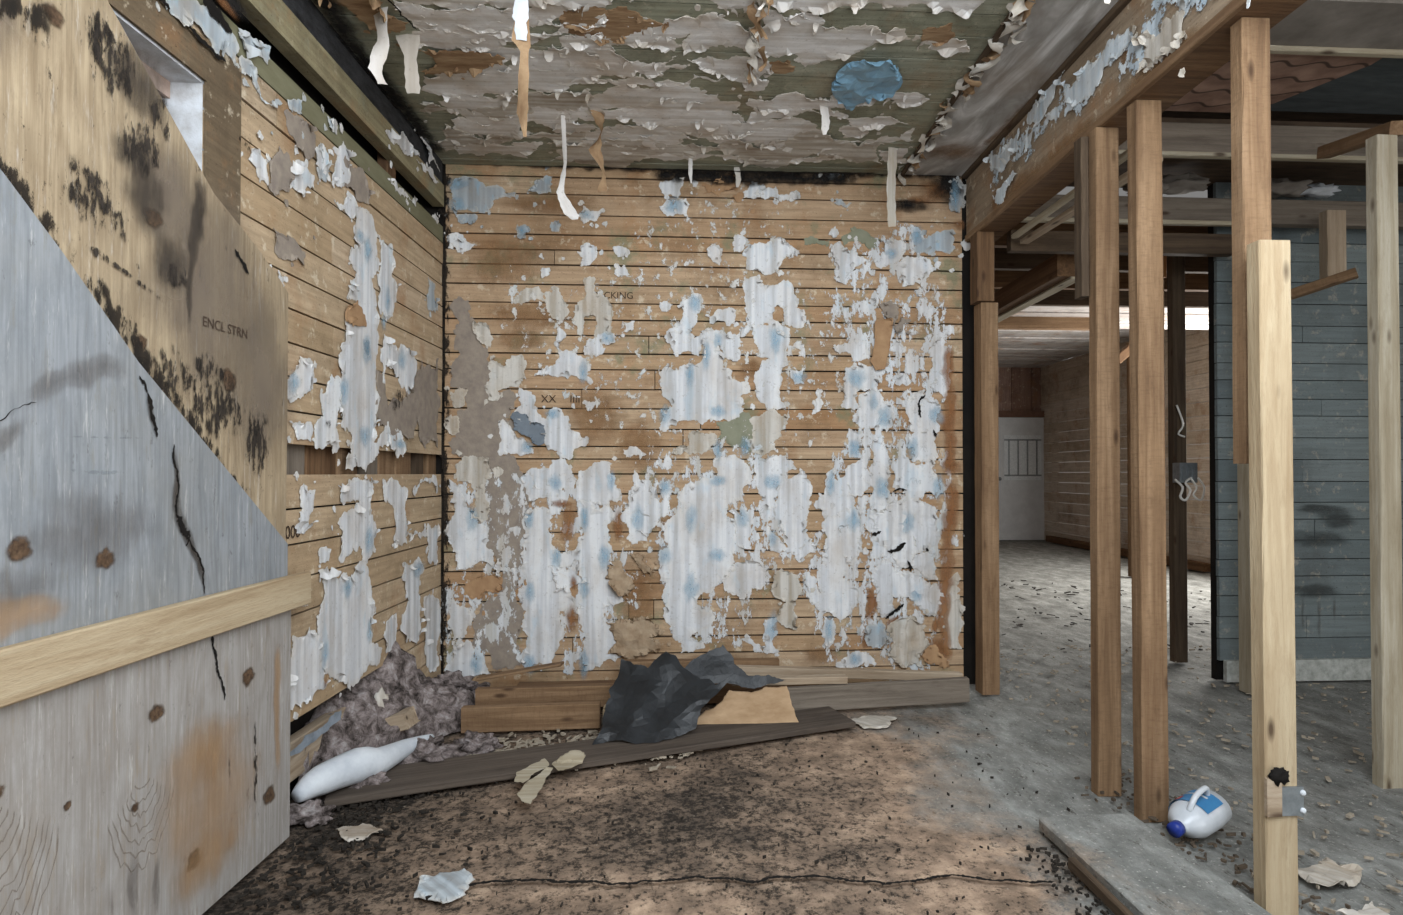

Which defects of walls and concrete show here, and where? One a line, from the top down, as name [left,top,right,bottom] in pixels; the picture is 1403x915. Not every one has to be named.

water stain [0,0,50,42]
peeling [983,0,1207,205]
water stain [0,157,59,247]
water stain [58,161,126,240]
water stain [81,9,282,490]
peeling [156,0,970,720]
crack [139,376,205,594]
water stain [173,463,203,576]
crack [211,636,226,700]
crack [469,874,1054,886]